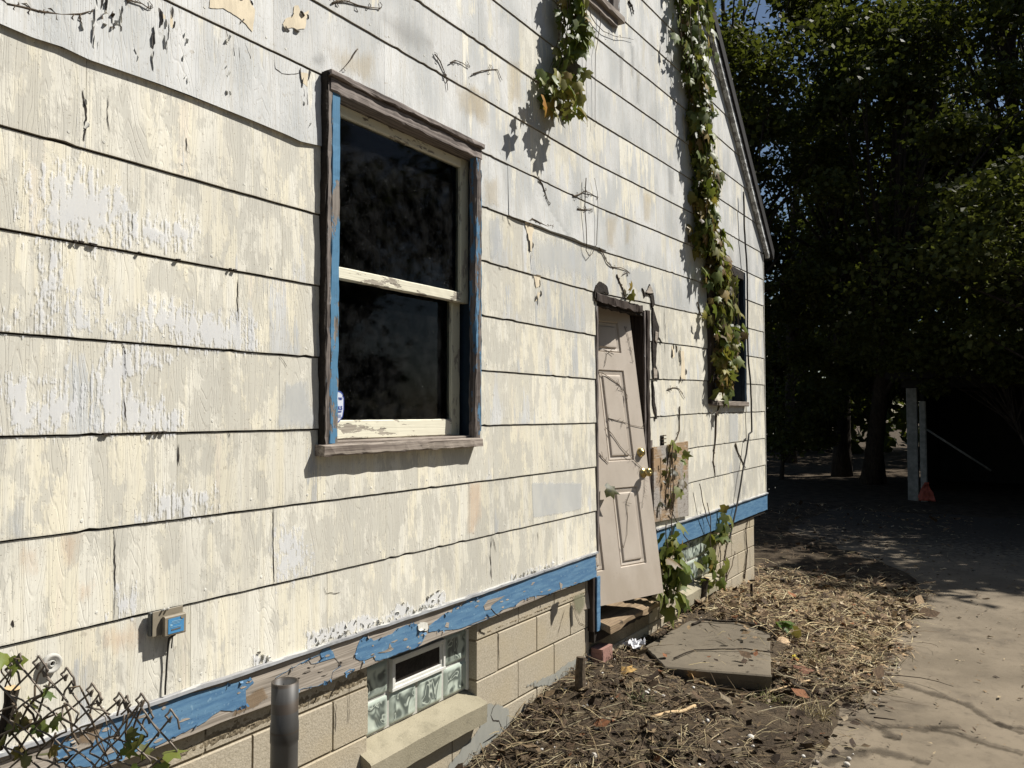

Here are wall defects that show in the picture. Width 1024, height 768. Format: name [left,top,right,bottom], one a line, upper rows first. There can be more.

peeling [92,0,123,49]
peeling [151,7,176,70]
peeling [209,0,255,32]
peeling [283,5,309,32]
peeling [525,222,534,251]
peeling [0,156,260,444]
peeling [672,344,687,382]
peeling [147,480,220,524]
peeling [269,524,316,594]
peeling [105,581,139,622]
peeling [275,555,598,692]
peeling [54,651,271,768]